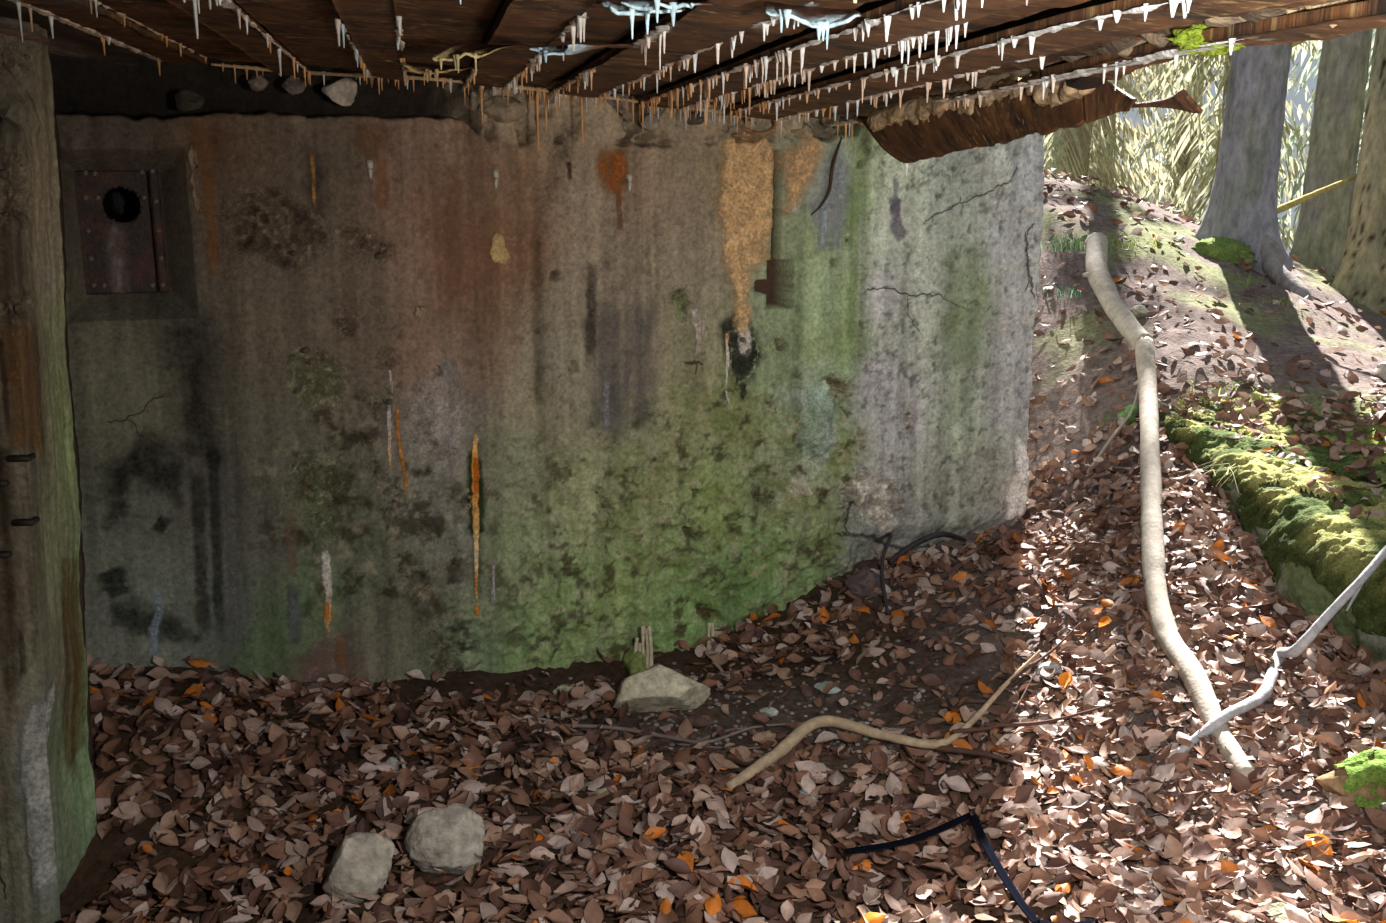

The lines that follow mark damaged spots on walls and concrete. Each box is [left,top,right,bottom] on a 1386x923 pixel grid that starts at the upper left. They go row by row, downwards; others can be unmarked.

leakage [939,43,1241,103]
rust [598,151,627,228]
rust [718,135,824,353]
leakage [175,327,238,622]
leakage [467,451,485,546]
rust [472,435,480,615]
leakage [100,568,179,651]